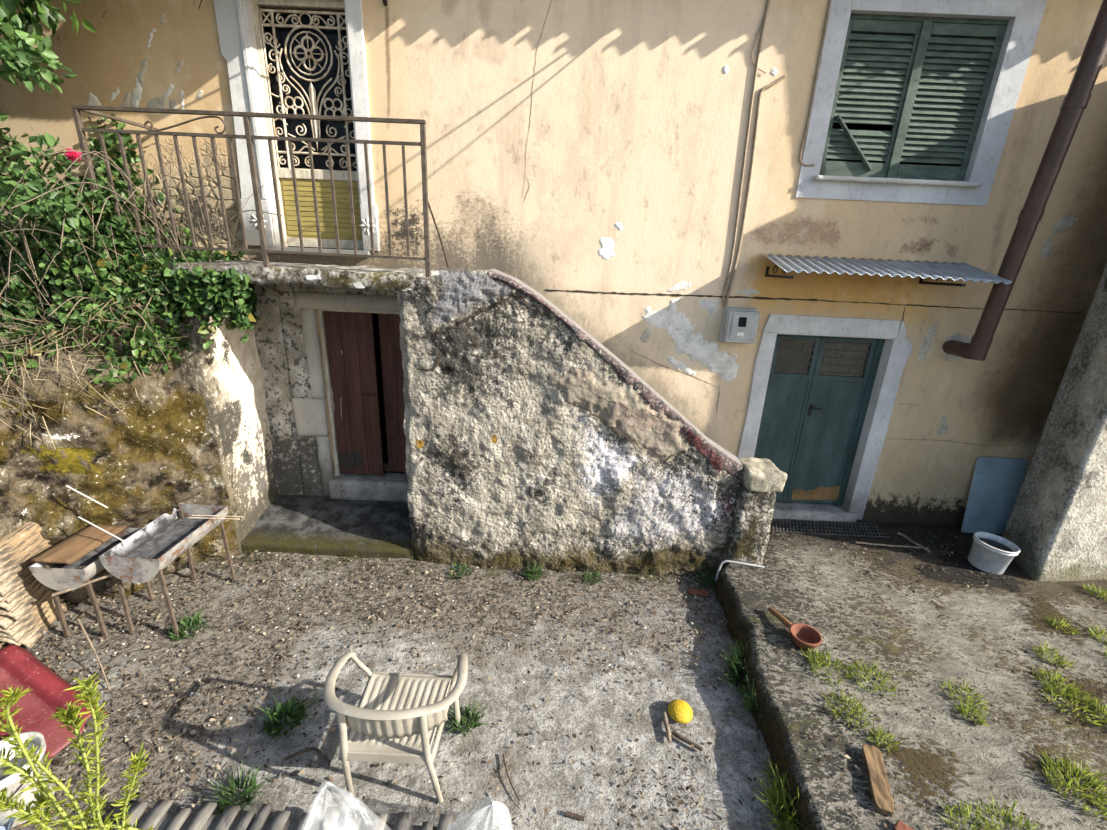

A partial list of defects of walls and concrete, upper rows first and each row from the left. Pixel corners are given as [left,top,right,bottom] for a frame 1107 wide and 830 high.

peeling [87,12,204,109]
crack [522,0,552,203]
peeling [598,222,624,260]
peeling [639,281,741,382]
peeling [569,409,735,557]